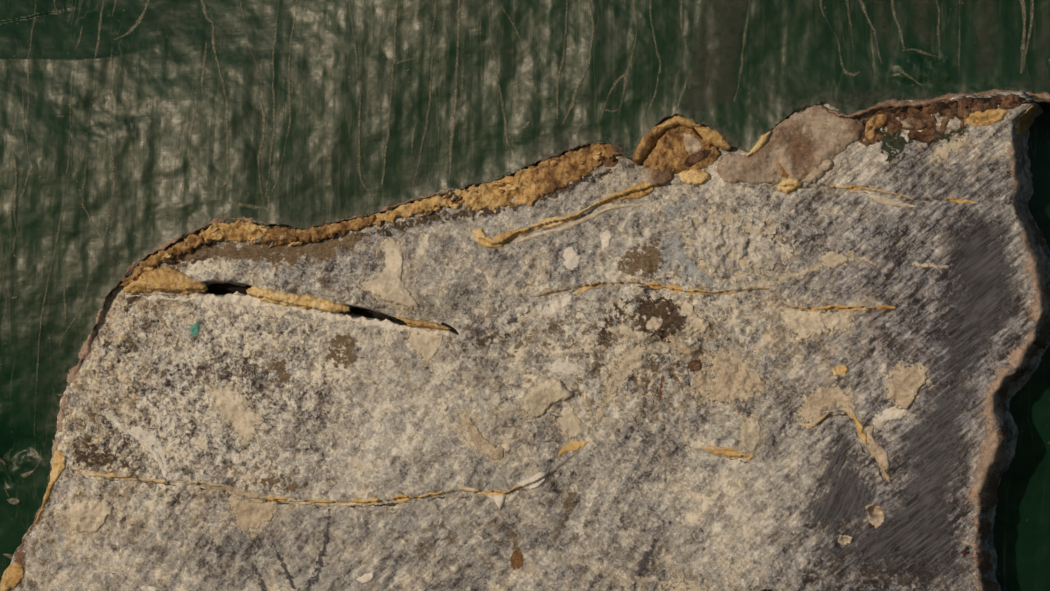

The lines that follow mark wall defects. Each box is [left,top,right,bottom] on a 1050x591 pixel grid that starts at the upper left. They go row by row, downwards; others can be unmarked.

peeling [865,113,888,139]
peeling [896,117,930,132]
peeling [202,219,265,250]
peeling [253,225,319,259]
crack [127,283,459,337]
peeling [645,317,663,333]